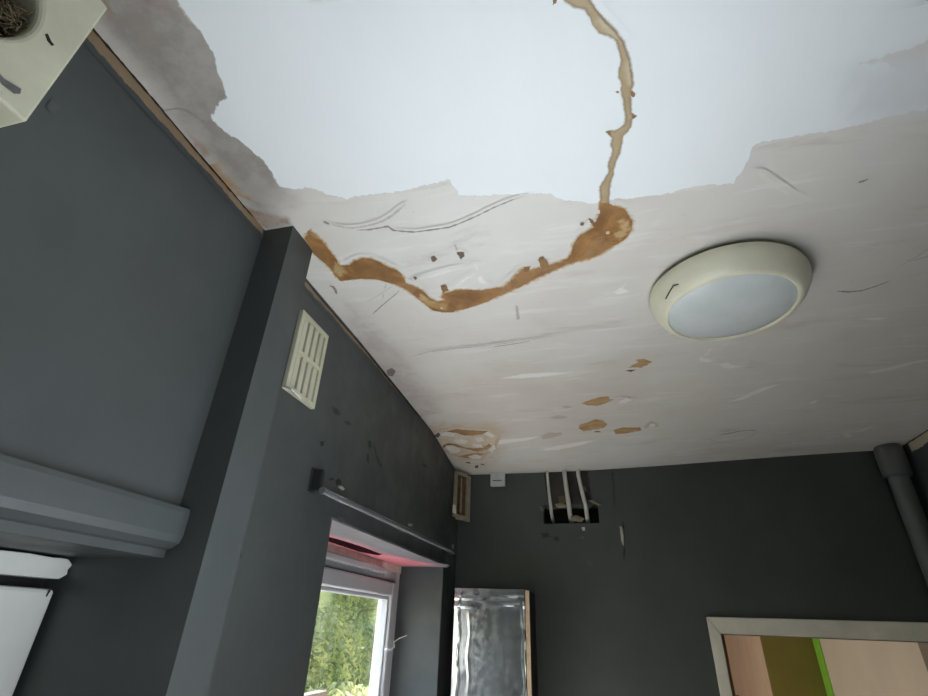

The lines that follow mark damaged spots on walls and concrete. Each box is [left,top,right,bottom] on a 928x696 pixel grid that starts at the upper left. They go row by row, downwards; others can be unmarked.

water stain [94,0,643,417]
spalling [451,242,467,261]
peeling [620,356,657,374]
peeling [421,393,663,474]
peeling [907,430,928,455]
spalling [539,470,601,544]